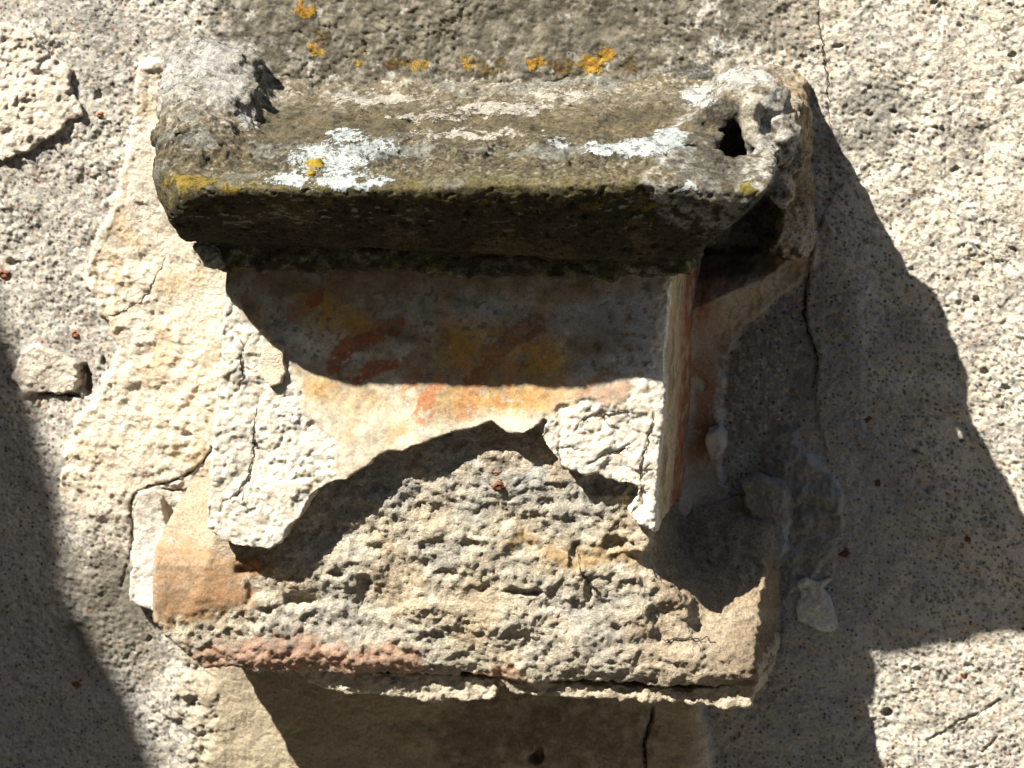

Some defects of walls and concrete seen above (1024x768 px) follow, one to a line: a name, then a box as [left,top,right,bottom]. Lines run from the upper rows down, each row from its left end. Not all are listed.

crack [818,2,832,128]
crack [801,268,819,381]
spalling [491,471,505,491]
flaking render [542,386,667,532]